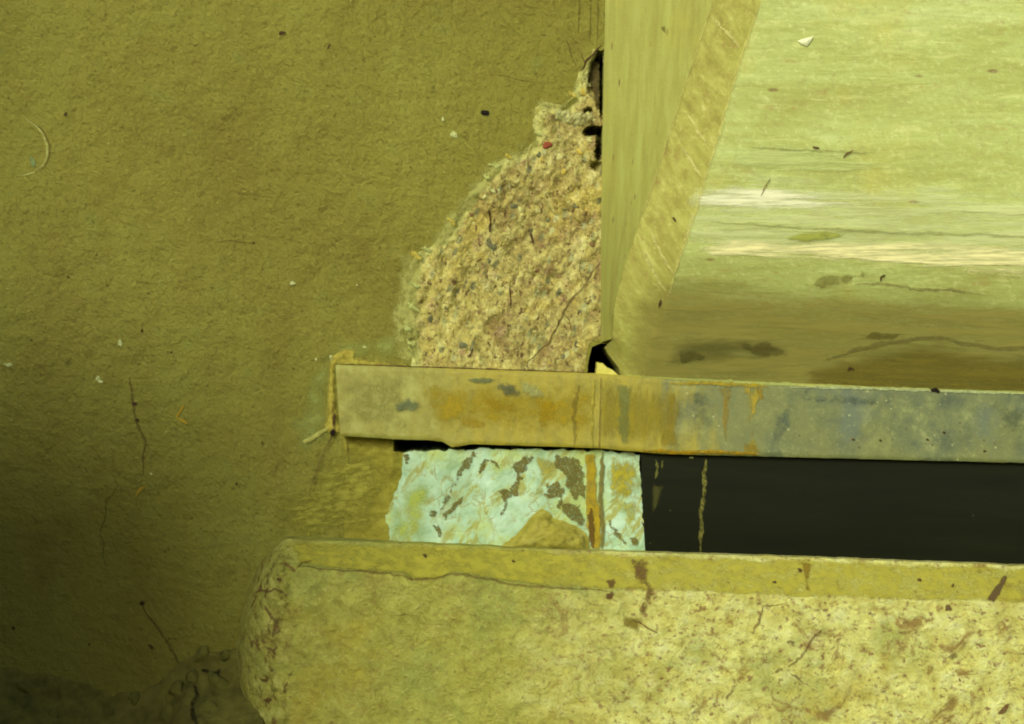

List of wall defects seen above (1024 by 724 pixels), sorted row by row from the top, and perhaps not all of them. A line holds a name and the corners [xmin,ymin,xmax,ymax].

spalling [393,49,618,375]
damp [640,274,1024,391]
crack [129,377,151,471]
corrosion [643,439,758,456]
corrosion [669,381,764,429]
peeling [429,451,499,537]
peeling [498,456,533,516]
peeling [545,455,586,525]
peeling [608,520,639,546]